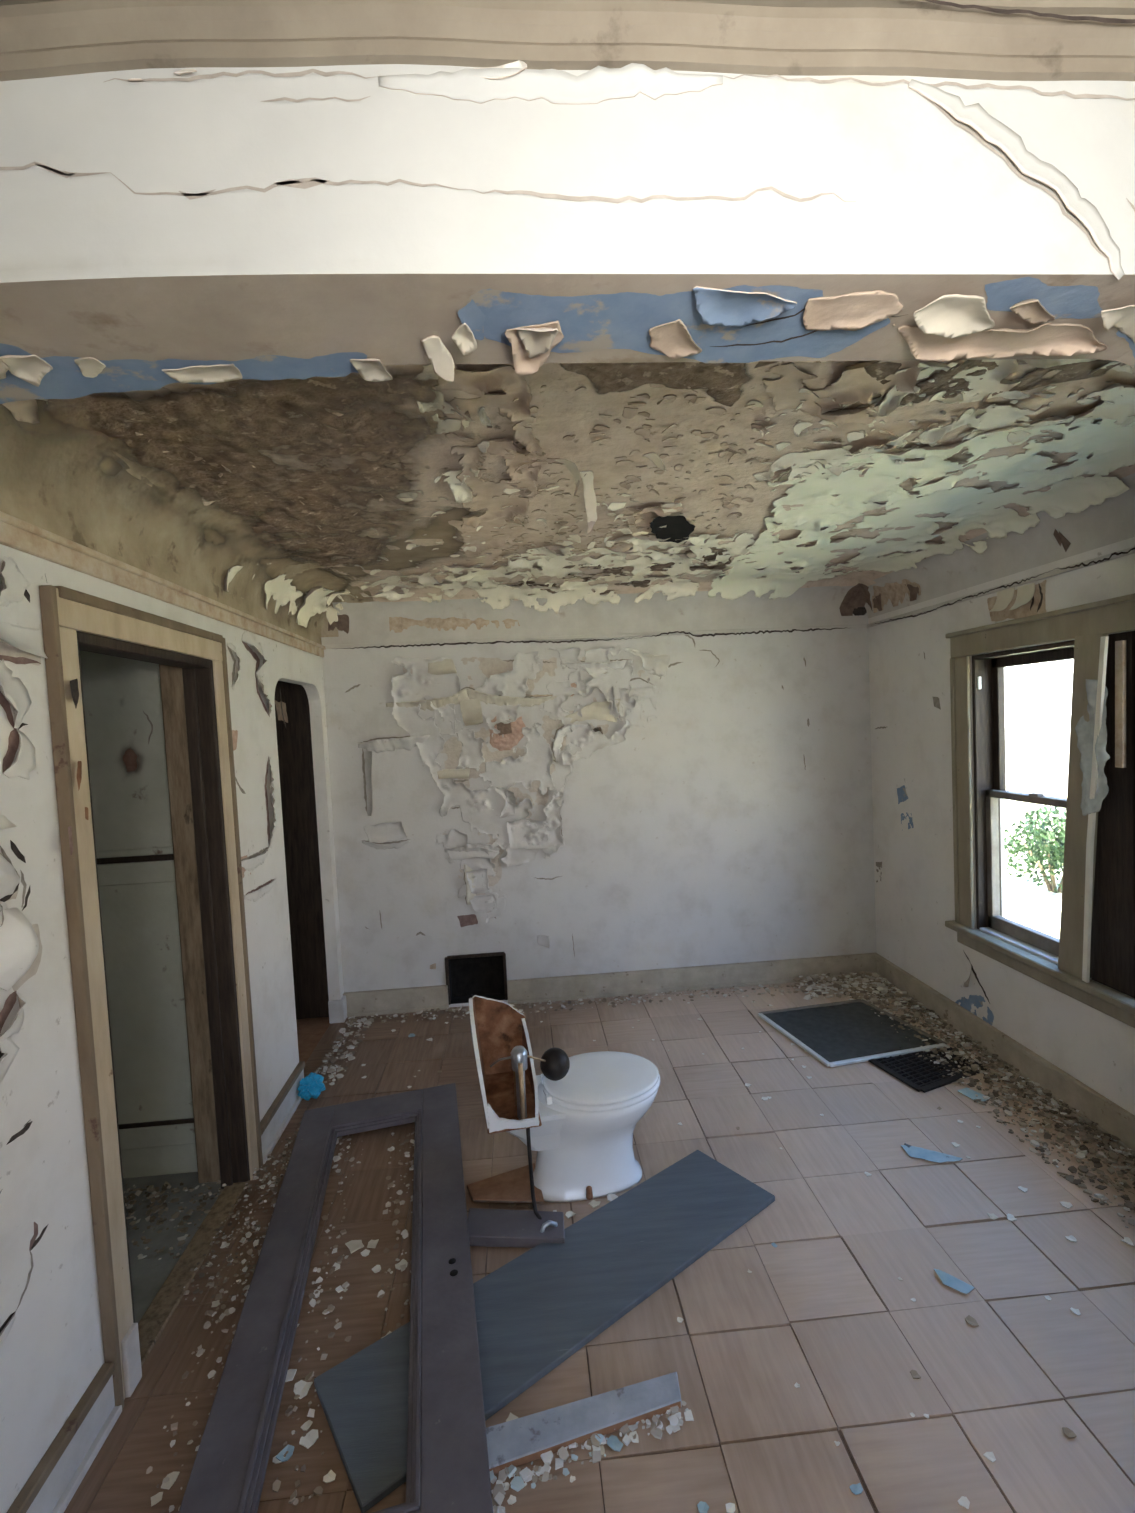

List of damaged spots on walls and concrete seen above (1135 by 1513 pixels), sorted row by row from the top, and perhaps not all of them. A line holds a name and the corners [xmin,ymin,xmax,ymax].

crack [925,0,1135,23]
crack [0,63,1135,280]
flaking render [0,277,1135,634]
peeling [0,555,47,666]
peeling [227,631,288,727]
water stain [258,507,471,597]
peeling [241,756,276,902]
peeling [358,646,670,927]
peeling [0,853,42,991]